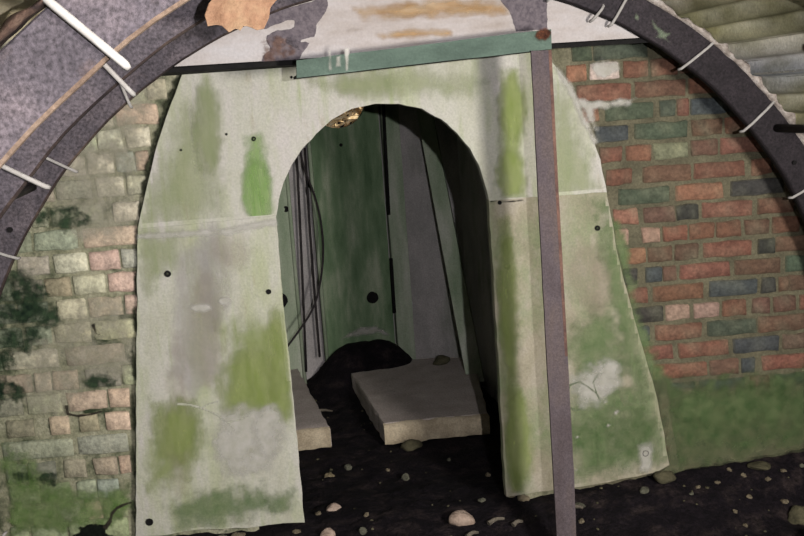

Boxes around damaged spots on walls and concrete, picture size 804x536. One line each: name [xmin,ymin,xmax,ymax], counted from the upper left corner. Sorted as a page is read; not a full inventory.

peeling [262,0,328,62]
leakage [647,0,804,145]
leakage [503,79,524,138]
leakage [139,163,276,238]
leakage [498,152,523,194]
leakage [214,333,289,473]
leakage [640,446,651,472]
hole [73,502,132,536]